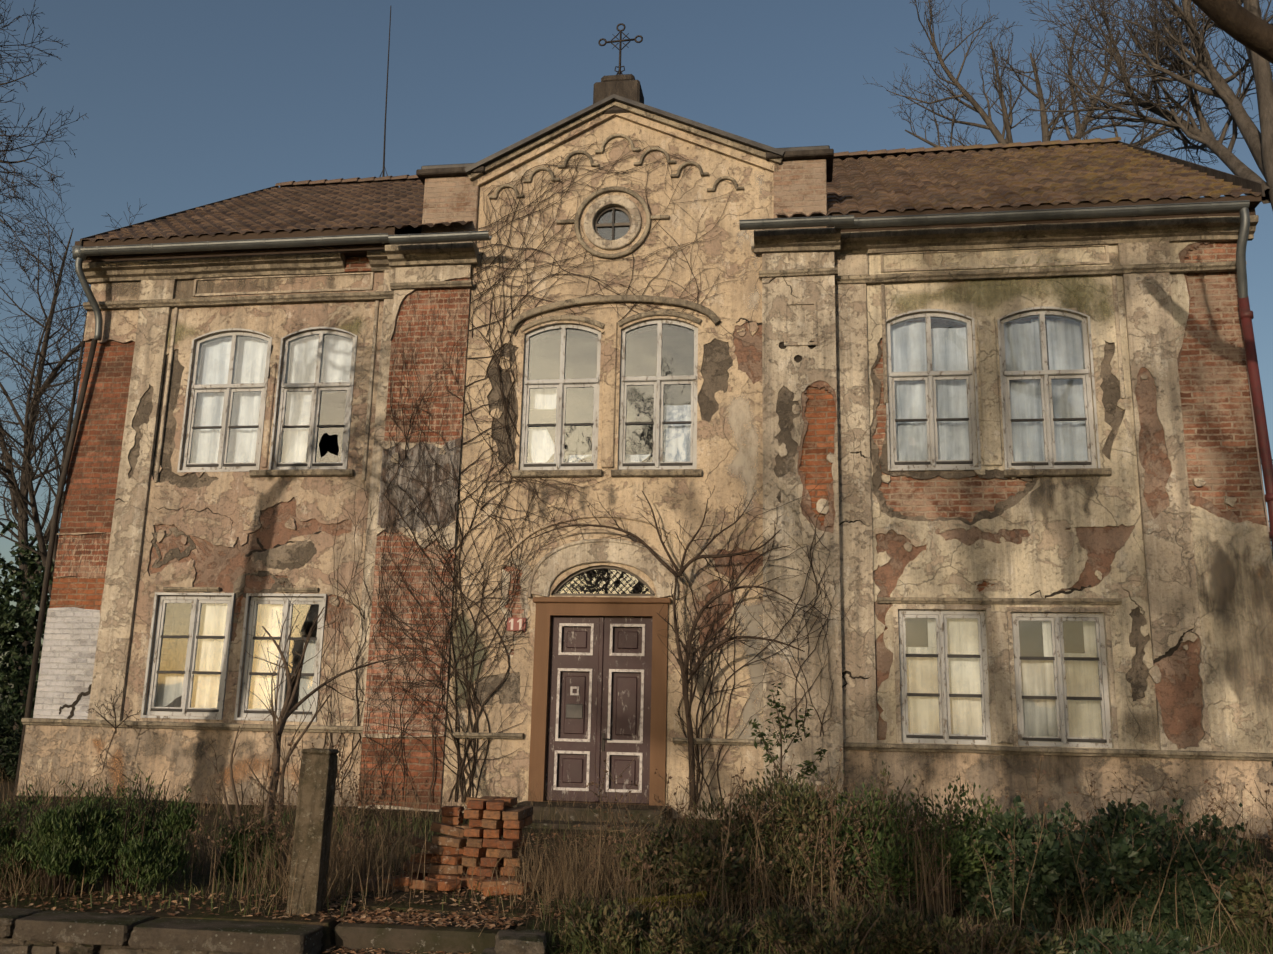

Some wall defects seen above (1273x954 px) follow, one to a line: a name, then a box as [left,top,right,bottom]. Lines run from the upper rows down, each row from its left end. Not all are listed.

flaking render [49,340,219,610]
spalling [148,497,354,641]
flaking render [358,278,471,810]
spalling [487,344,518,465]
spalling [697,321,762,422]
flaking render [774,381,837,533]
flaking render [870,338,1040,740]
spalling [1059,524,1135,591]
spalling [1100,342,1172,519]
flaking render [1177,241,1267,526]
crack [59,684,92,726]
spalling [1125,605,1205,749]